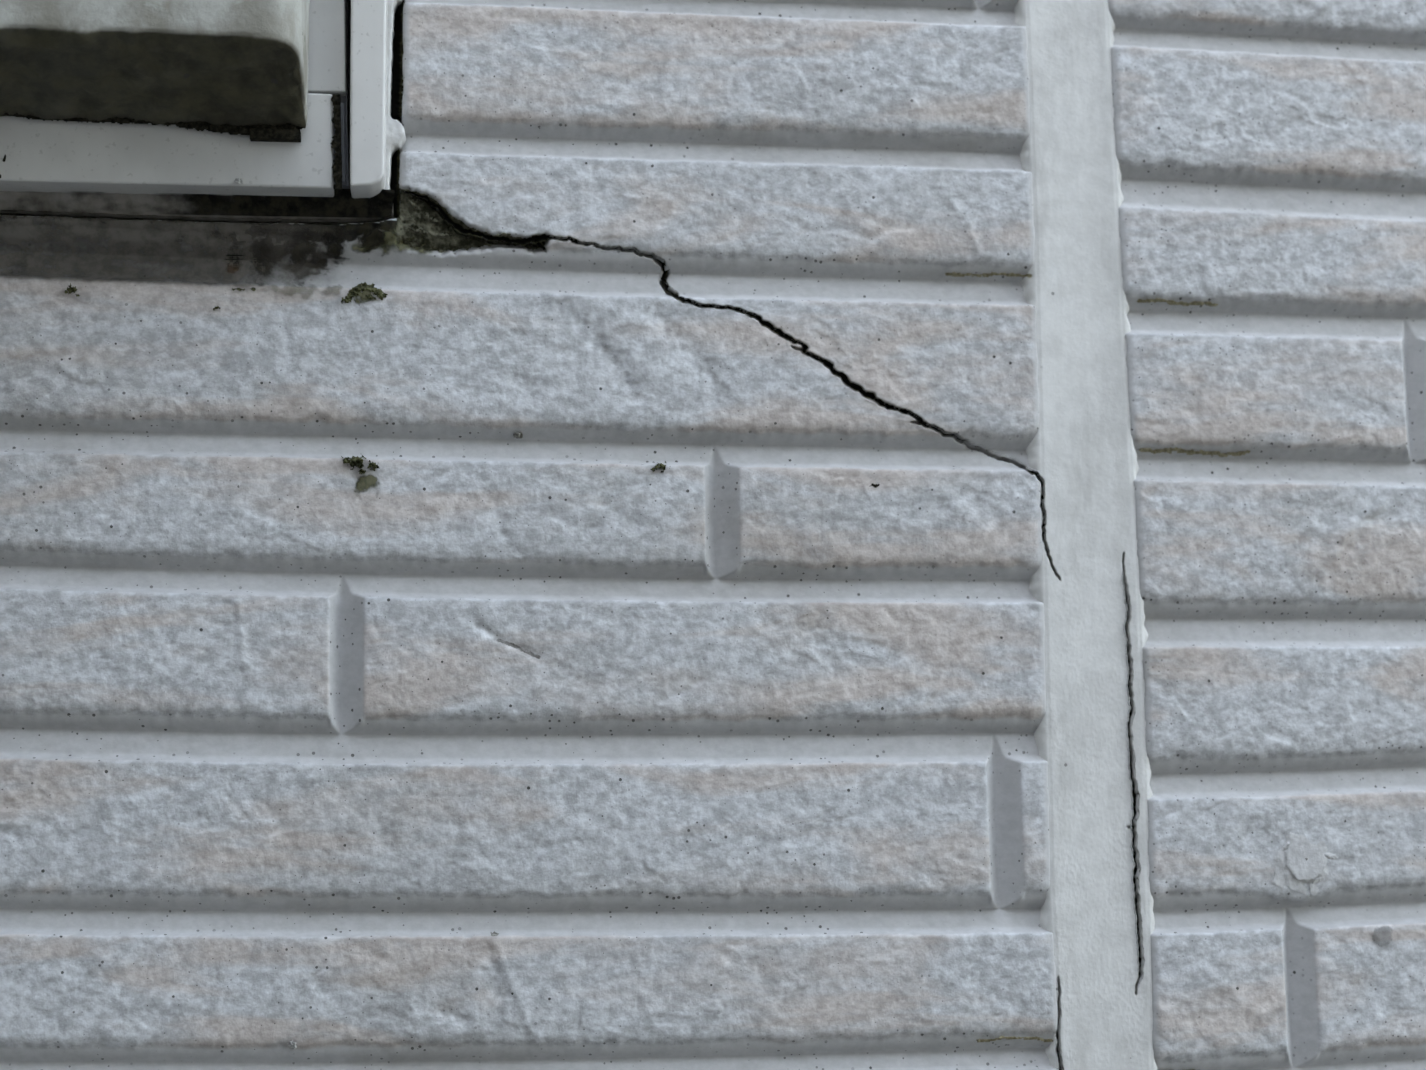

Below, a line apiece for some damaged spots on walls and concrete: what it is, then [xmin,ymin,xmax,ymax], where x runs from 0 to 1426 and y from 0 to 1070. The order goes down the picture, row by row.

water stain [156,189,421,286]
crack [405,191,1061,578]
crack [1122,555,1145,978]